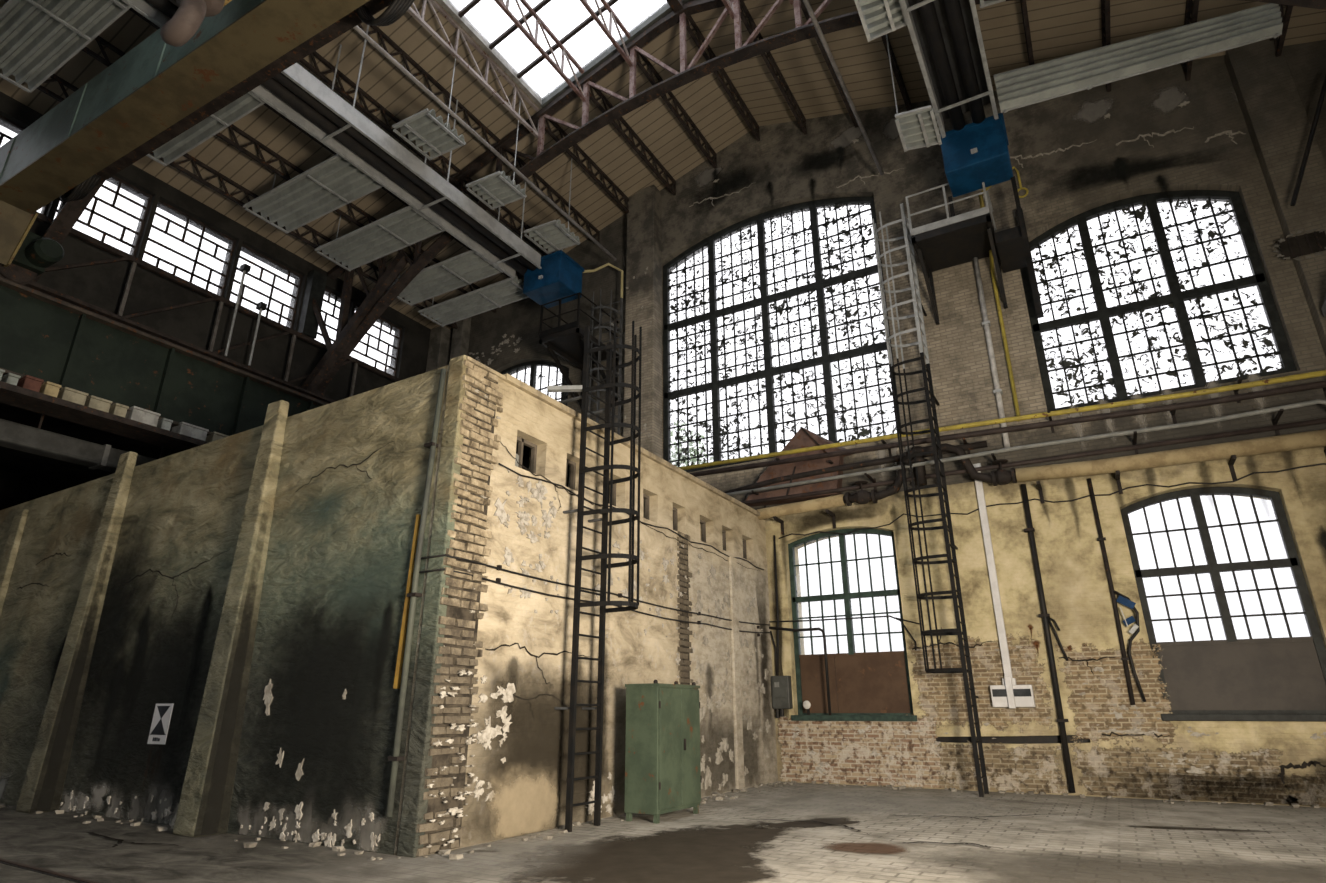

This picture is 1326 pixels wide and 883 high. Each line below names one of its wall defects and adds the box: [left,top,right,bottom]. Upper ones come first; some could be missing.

crack [1010,127,1246,168]
peeling [60,785,179,826]
water stain [30,547,212,813]
water stain [194,587,257,837]
peeling [238,802,381,852]
water stain [256,603,392,828]
flaking render [416,334,560,856]
crack [485,643,590,721]
flaking render [593,531,1326,806]
water stain [1318,529,1326,555]